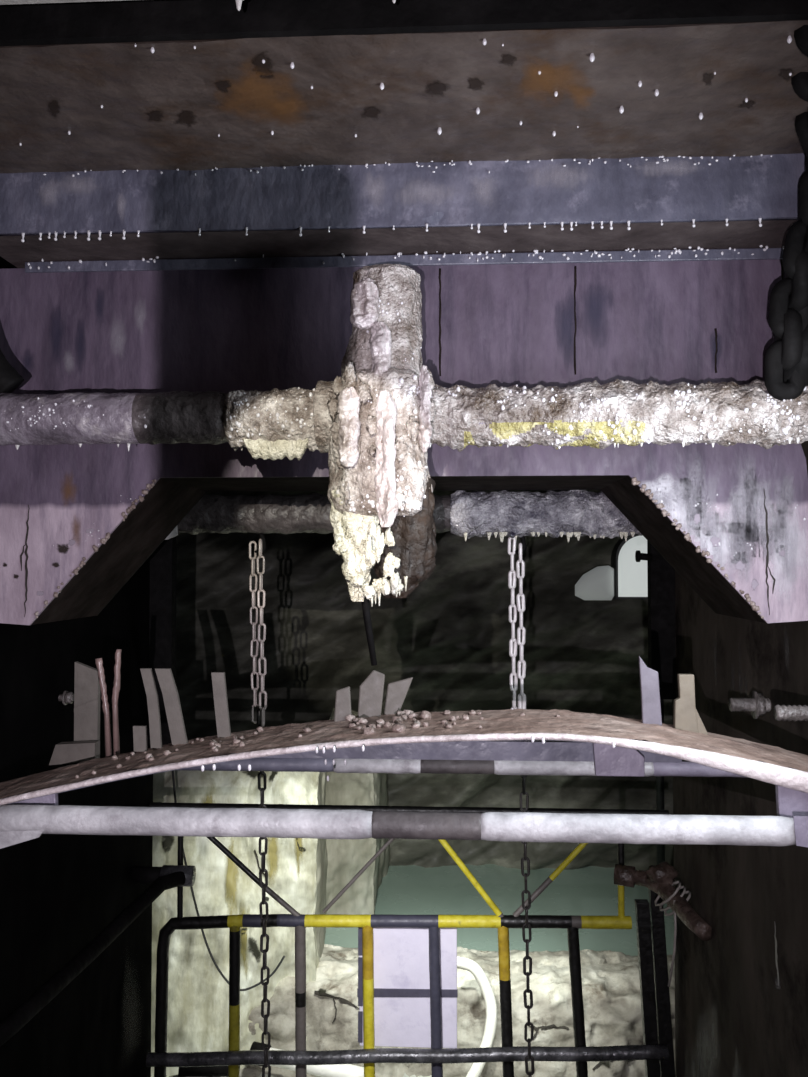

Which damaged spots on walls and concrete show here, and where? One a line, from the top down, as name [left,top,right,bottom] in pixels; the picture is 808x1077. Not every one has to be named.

rust [227,53,297,115]
crack [20,505,30,617]
crack [764,490,776,615]
water stain [244,771,278,781]
water stain [163,836,174,852]
water stain [268,837,278,878]
water stain [296,838,306,873]
water stain [226,846,245,915]
water stain [241,927,261,968]